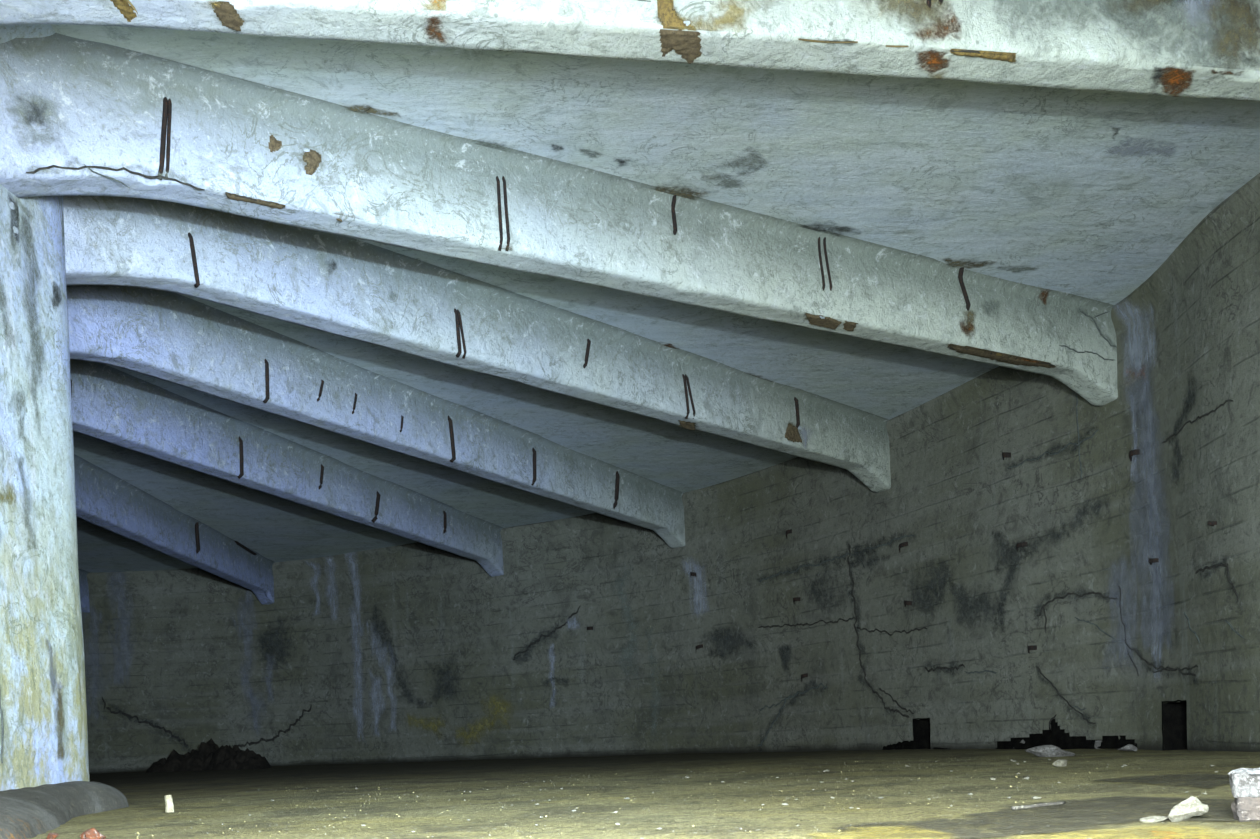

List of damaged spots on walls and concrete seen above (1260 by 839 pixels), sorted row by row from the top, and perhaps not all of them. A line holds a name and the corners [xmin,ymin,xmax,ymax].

spalling [657,0,702,64]
corrosion [717,6,744,25]
corrosion [880,0,961,78]
corrosion [1153,67,1194,96]
water stain [16,215,44,436]
water stain [0,460,35,543]
water stain [1117,304,1162,676]
crack [758,534,927,718]
crack [1035,585,1200,683]
crack [232,705,312,747]
crack [1035,666,1096,725]
spalling [995,715,1137,749]